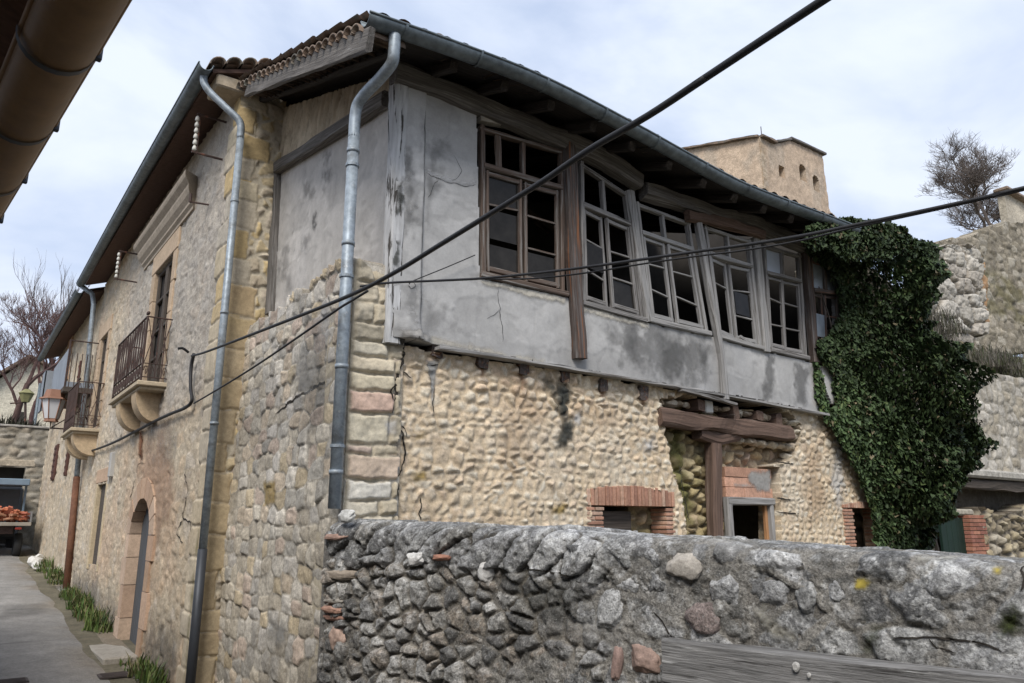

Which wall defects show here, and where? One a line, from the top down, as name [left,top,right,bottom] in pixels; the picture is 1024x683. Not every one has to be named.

crack [422,111,475,250]
crack [390,346,438,520]
water stain [546,381,580,446]
crack [176,474,191,543]